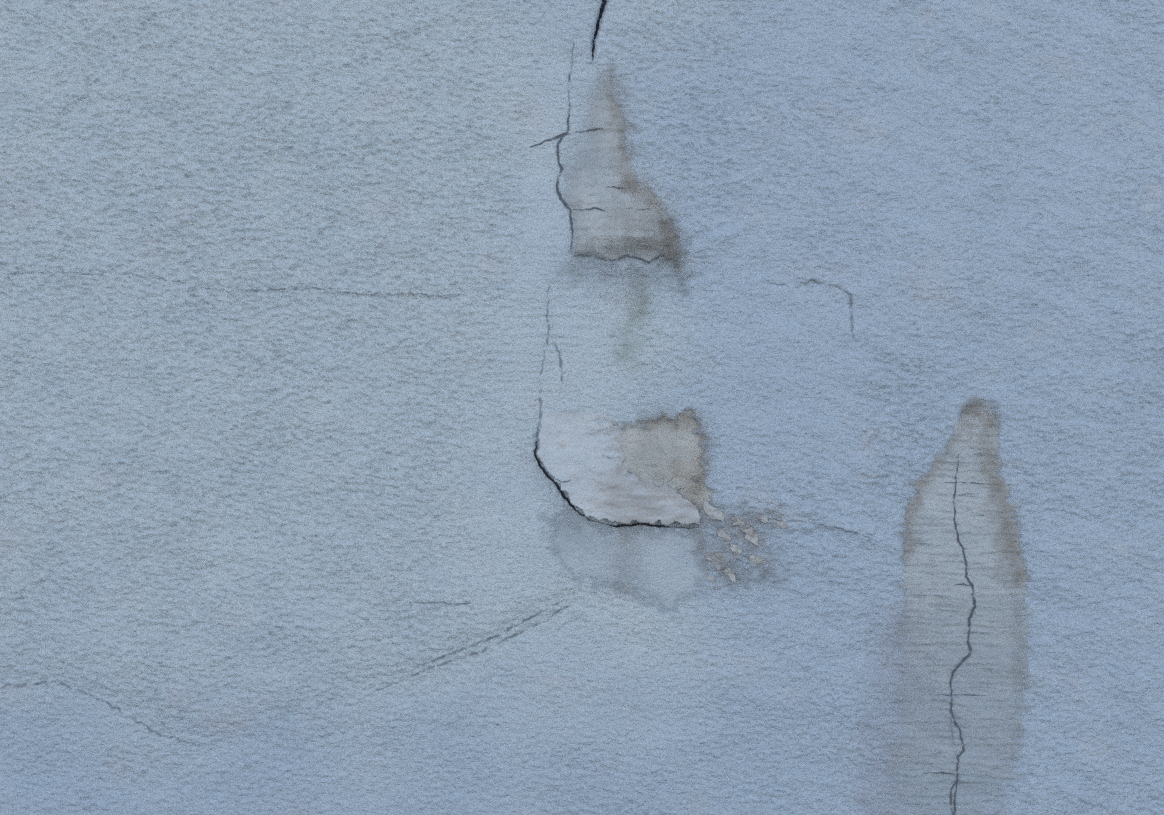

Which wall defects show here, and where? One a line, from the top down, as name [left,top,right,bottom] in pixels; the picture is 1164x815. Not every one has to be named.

crack [529,0,607,251]
crack [533,285,563,452]
peeling [534,409,713,612]
crack [949,460,976,815]